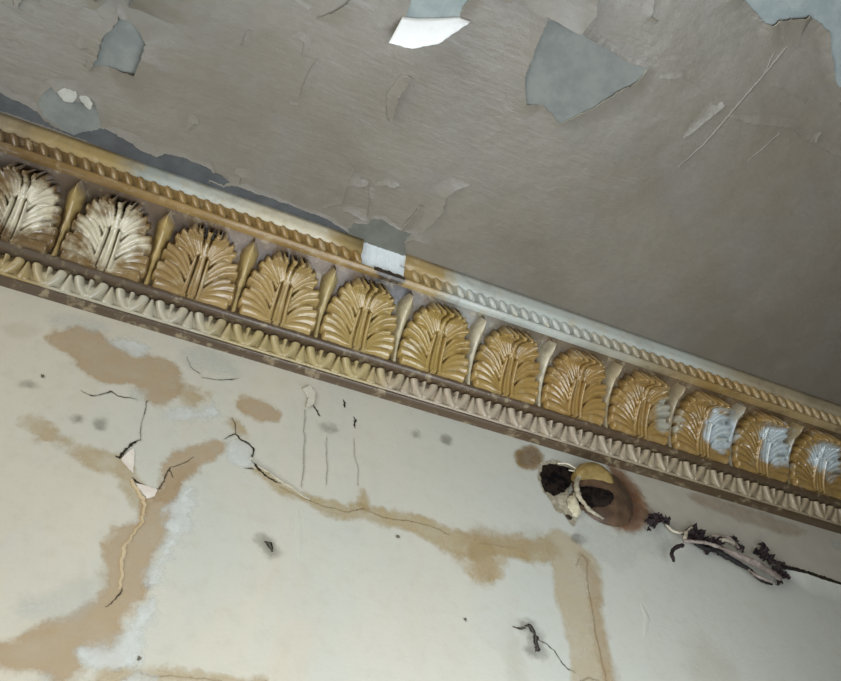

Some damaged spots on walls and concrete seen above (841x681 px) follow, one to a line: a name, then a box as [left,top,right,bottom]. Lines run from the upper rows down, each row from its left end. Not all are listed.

peeling [396,0,490,22]
peeling [75,0,215,115]
peeling [0,77,470,280]
damp [51,327,180,403]
crack [82,391,148,459]
crack [132,459,190,490]
damp [237,399,280,421]
crack [225,419,450,536]
damp [515,446,542,469]
damp [0,442,258,681]
peeling [537,459,841,603]
crack [786,565,841,585]